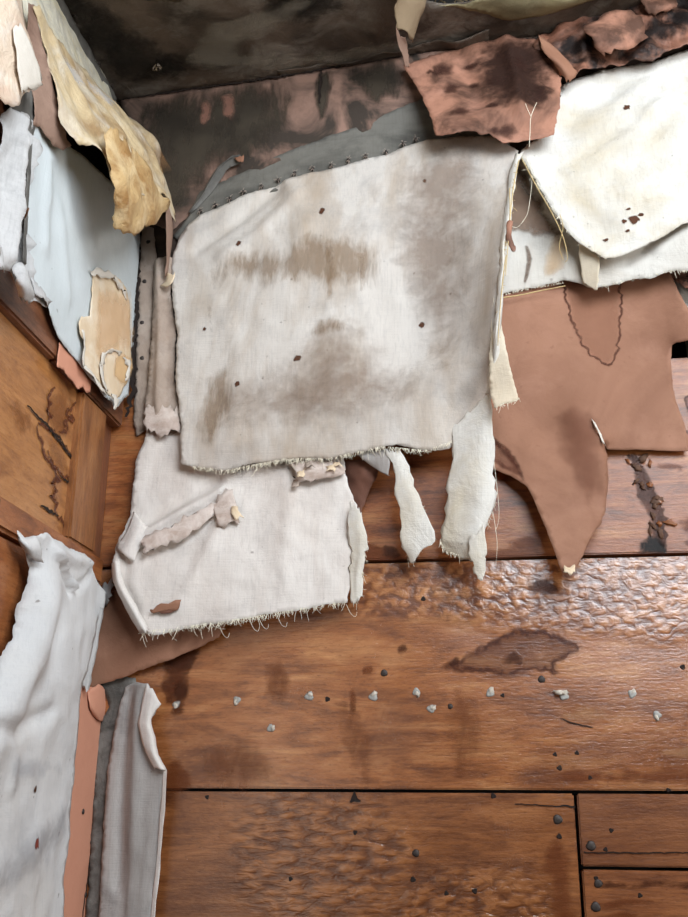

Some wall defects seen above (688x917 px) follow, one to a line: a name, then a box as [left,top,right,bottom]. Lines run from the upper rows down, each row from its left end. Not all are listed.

peeling [79,267,132,410]
crack [27,405,72,483]
damp [445,628,579,675]